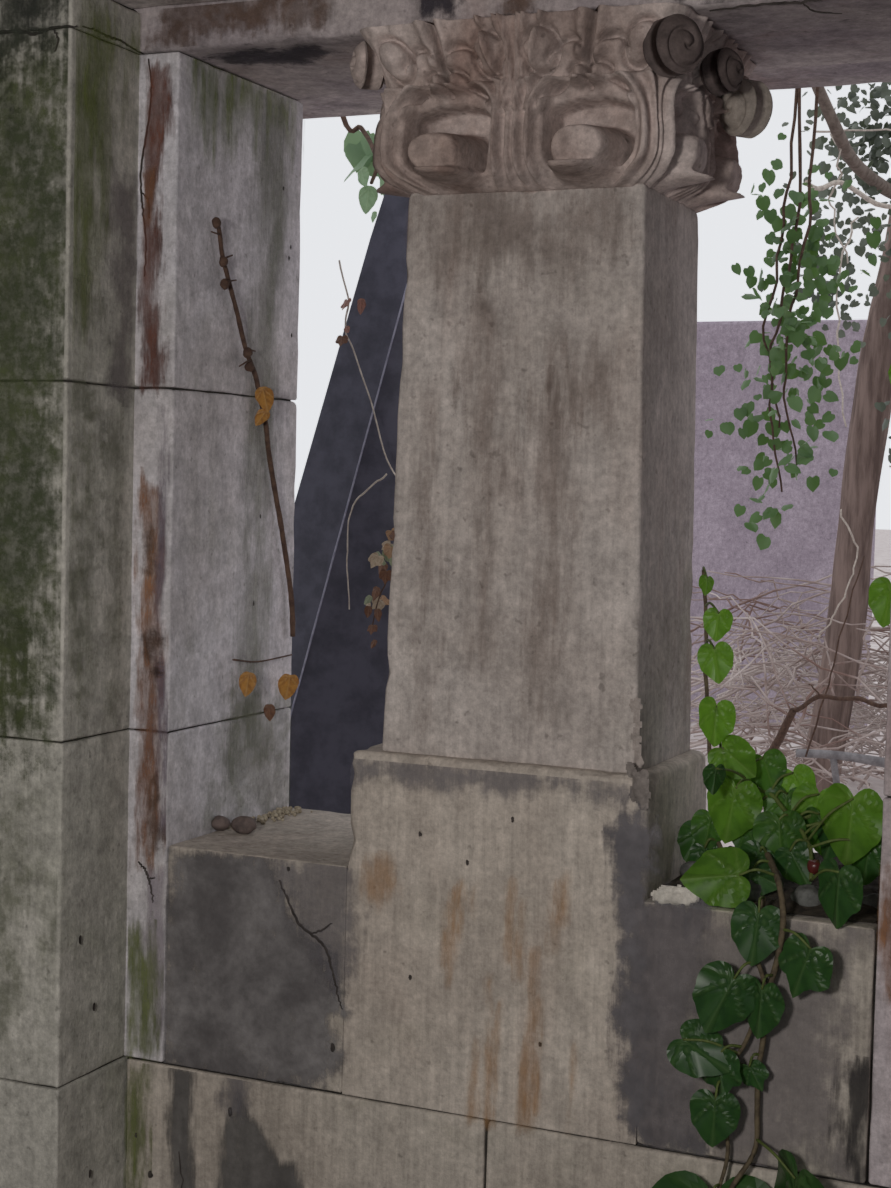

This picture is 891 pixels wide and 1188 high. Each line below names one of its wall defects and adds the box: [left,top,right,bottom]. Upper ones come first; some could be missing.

damp [73,13,138,402]
corrosion [137,476,164,872]
damp [124,1069,152,1181]
damp [148,850,349,1188]
crack [279,880,343,1010]
damp [603,804,858,1178]